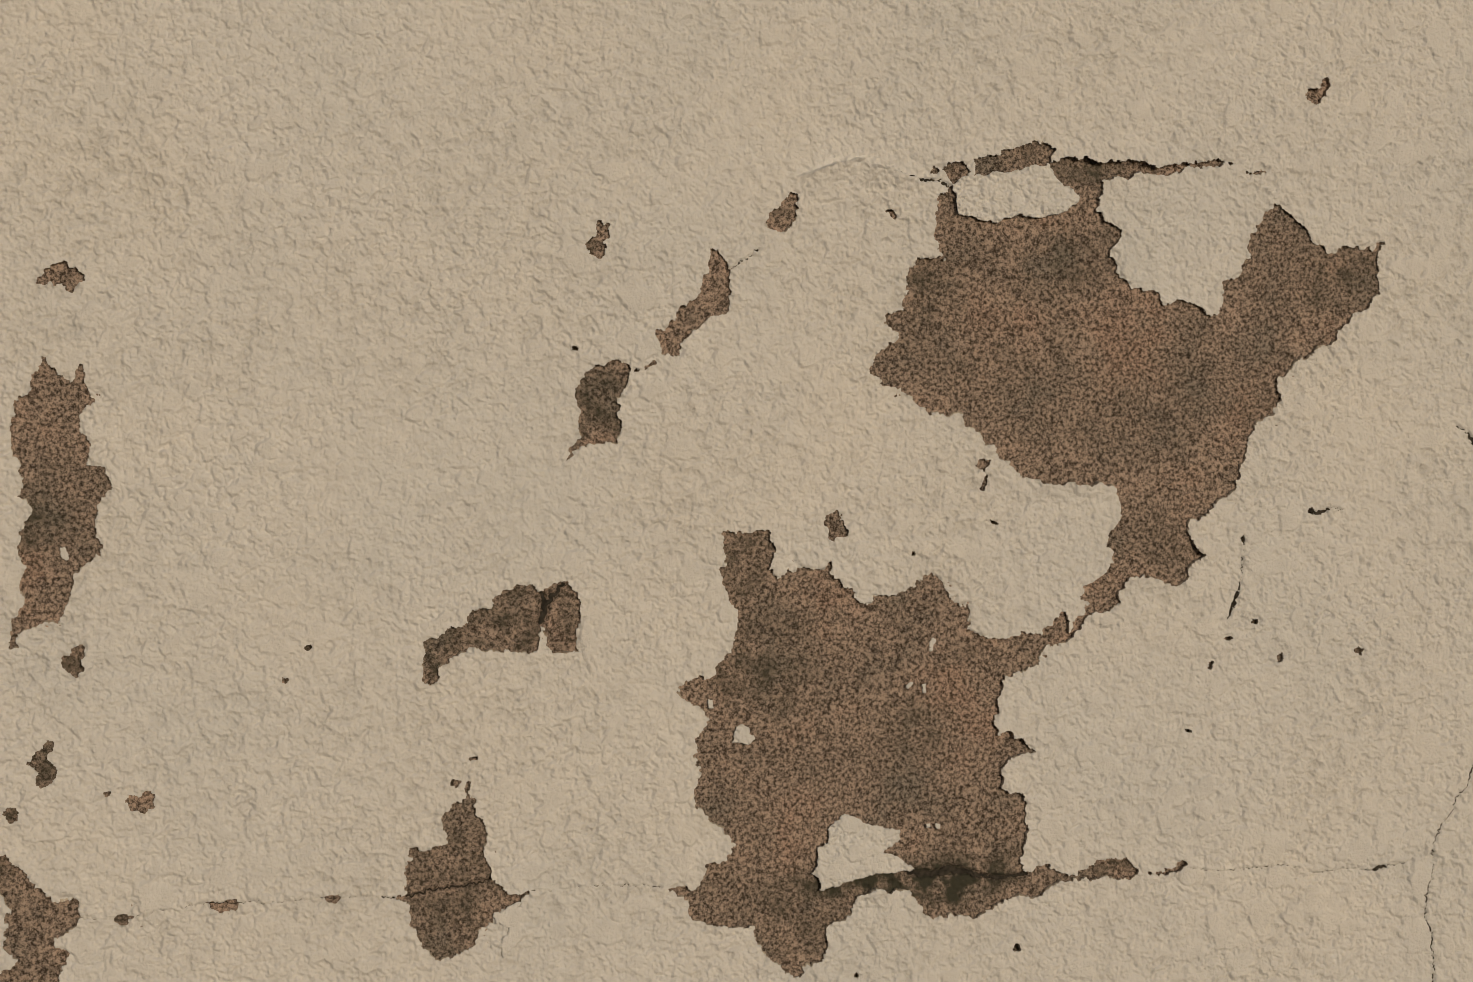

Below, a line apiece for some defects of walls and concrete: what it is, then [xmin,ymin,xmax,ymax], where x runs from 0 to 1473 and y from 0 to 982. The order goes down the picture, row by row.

spalling [36,260,85,293]
spalling [566,248,732,461]
spalling [9,356,113,650]
spalling [422,581,581,686]
spalling [668,140,1385,978]
crack [1227,537,1245,619]
crack [1310,507,1343,515]
spalling [0,855,81,982]
spalling [390,779,530,961]
crack [1193,765,1473,982]